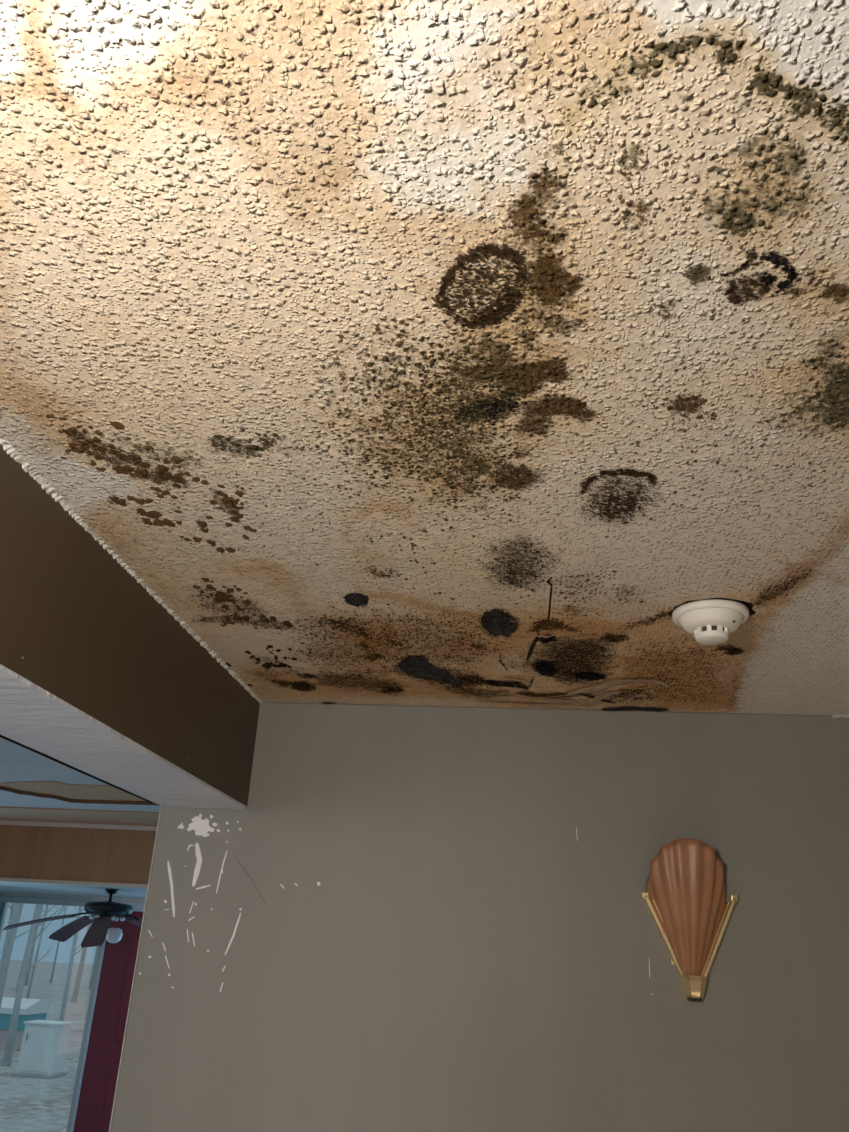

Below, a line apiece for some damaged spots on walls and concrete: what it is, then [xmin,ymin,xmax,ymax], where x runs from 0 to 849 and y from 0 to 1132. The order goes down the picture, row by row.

water stain [0,0,849,714]
peeling [177,814,242,843]